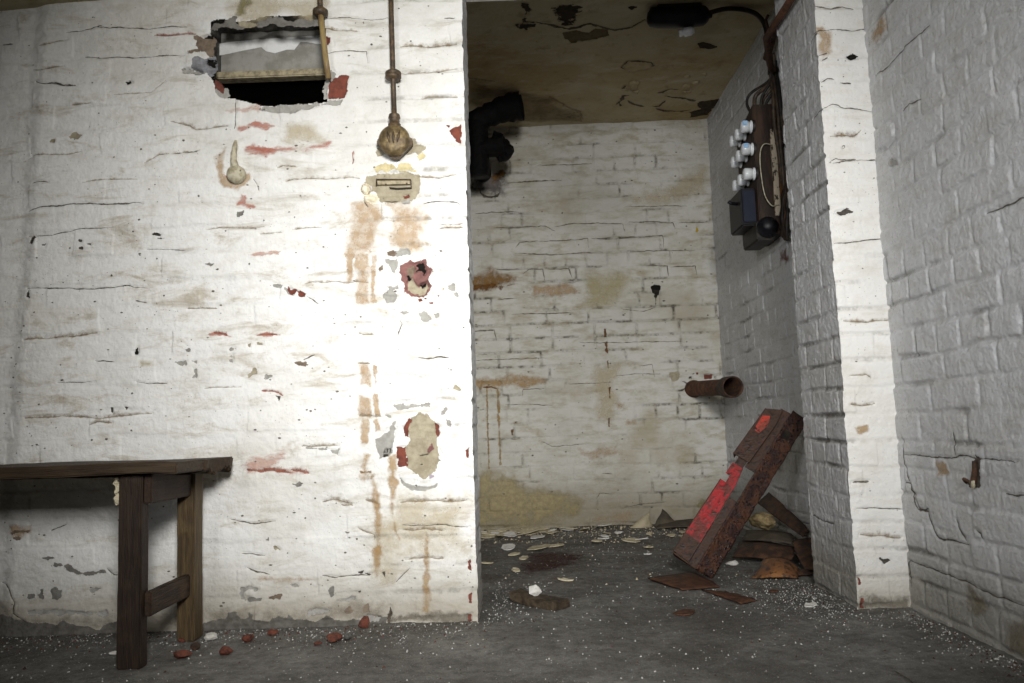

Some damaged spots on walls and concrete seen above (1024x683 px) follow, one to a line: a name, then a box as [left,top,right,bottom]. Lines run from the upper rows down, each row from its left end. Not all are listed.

flaking render [562,28,609,43]
spalling [182,15,349,114]
flaking render [690,99,719,117]
spalling [379,248,459,322]
rust [473,271,512,291]
peeling [375,402,452,459]
rust [476,376,544,468]
damp [479,472,579,527]
crack [853,432,1015,545]